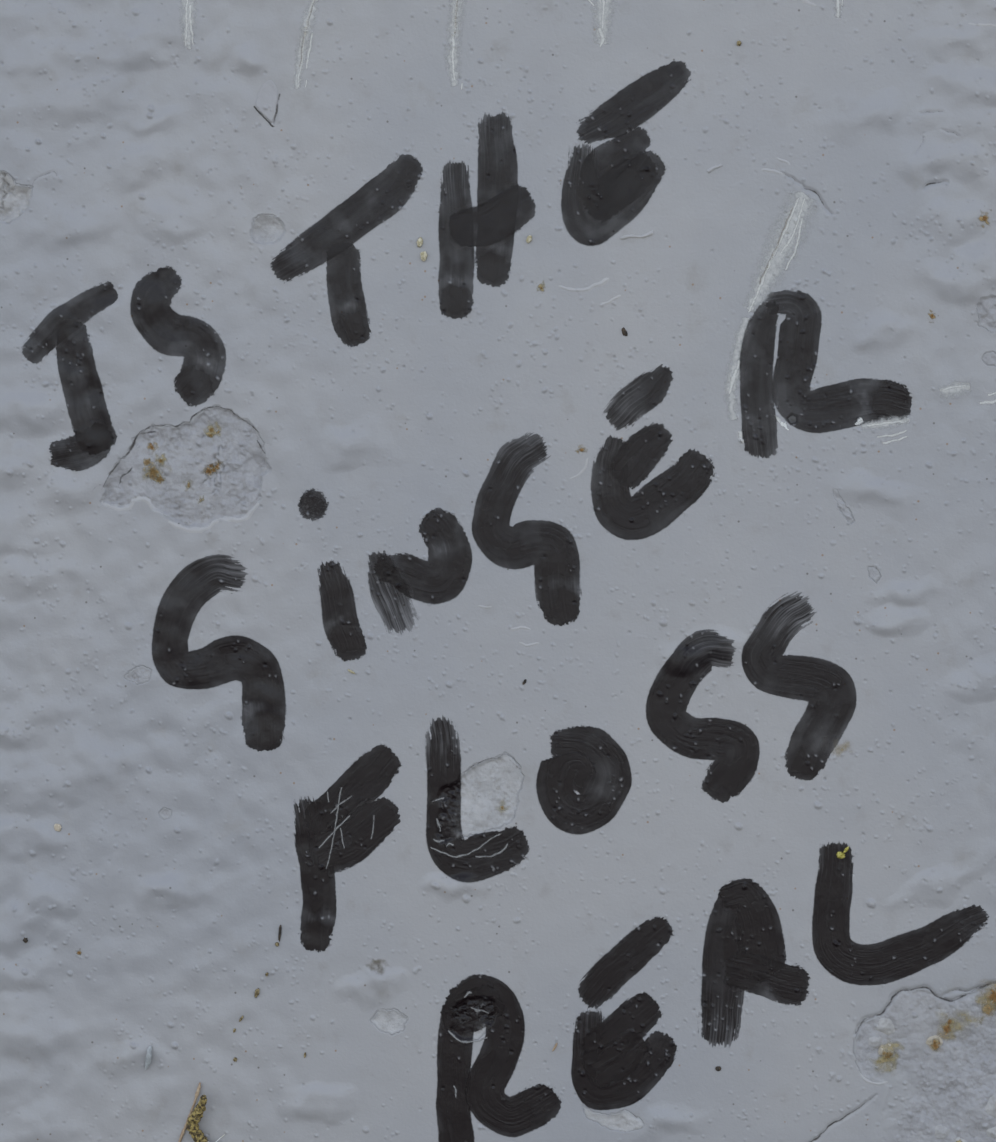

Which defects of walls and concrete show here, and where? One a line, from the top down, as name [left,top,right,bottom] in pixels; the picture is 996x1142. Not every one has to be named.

peeling [0,171,33,224]
peeling [100,405,271,528]
peeling [442,752,524,837]
peeling [853,982,996,1142]